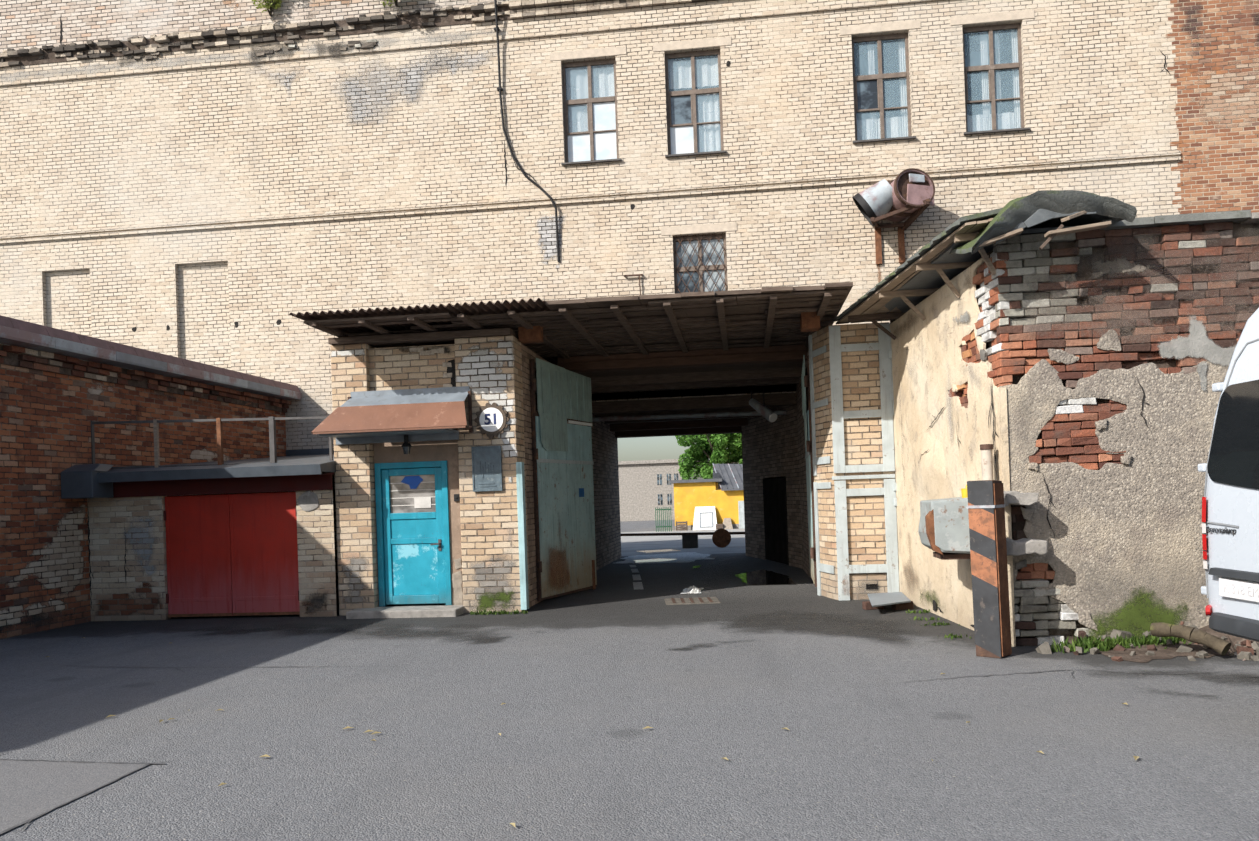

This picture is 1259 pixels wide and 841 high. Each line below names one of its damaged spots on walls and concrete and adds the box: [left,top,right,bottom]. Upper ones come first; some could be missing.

spalling [134,52,161,60]
leakage [347,56,486,119]
spalling [961,222,1259,471]
spalling [948,382,968,408]